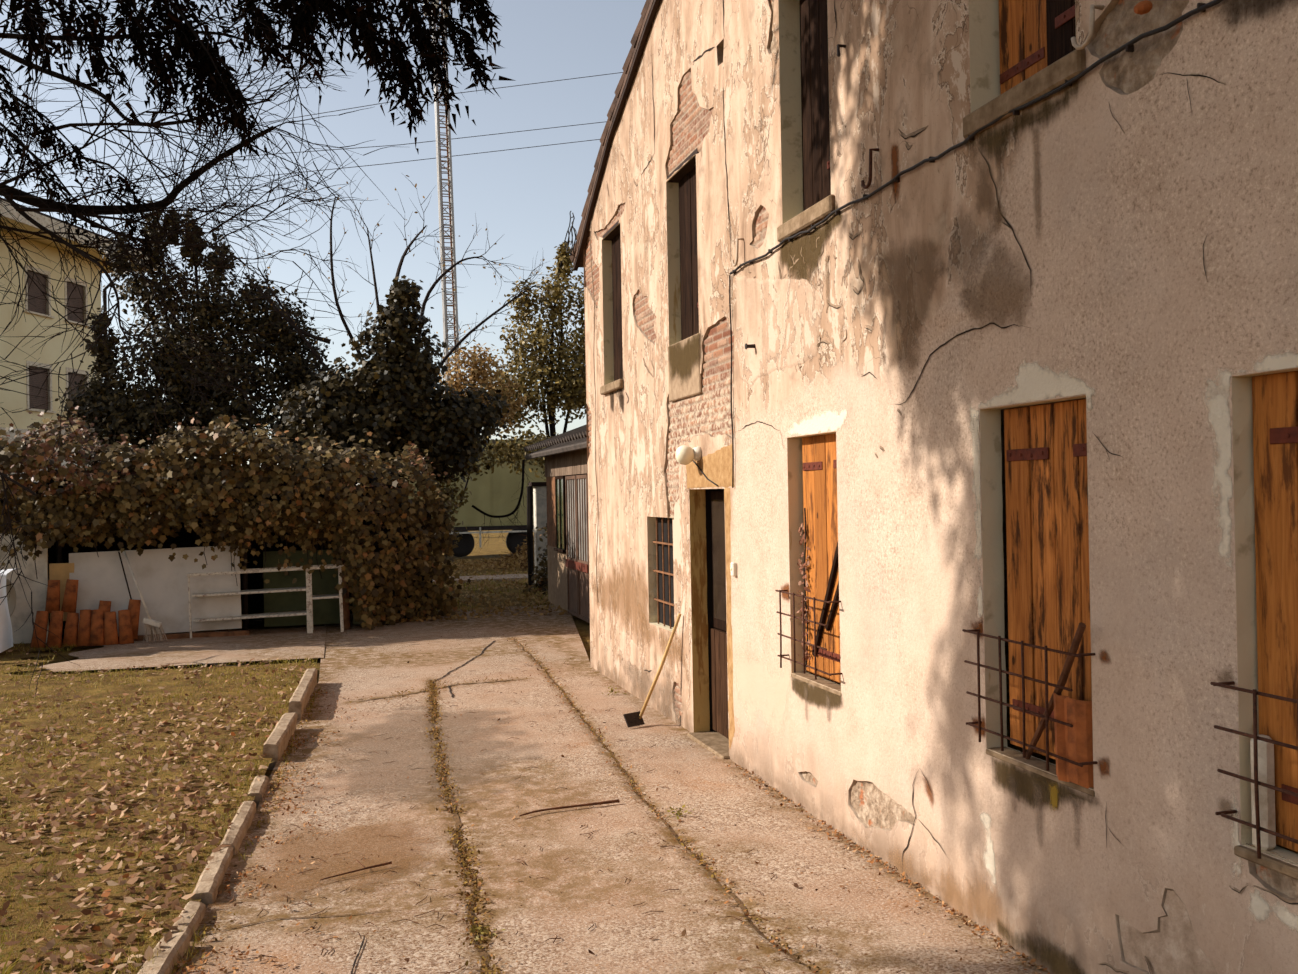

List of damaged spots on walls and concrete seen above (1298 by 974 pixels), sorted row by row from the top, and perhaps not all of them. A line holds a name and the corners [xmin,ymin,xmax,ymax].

spalling [665,67,714,179]
crack [975,143,1031,294]
spalling [632,289,656,377]
peeling [664,237,847,520]
peeling [841,259,866,295]
water stain [880,247,933,363]
crack [898,322,1031,405]
spalling [798,771,818,788]
spalling [848,779,917,831]
peeling [1229,734,1298,905]
spalling [1099,888,1217,974]